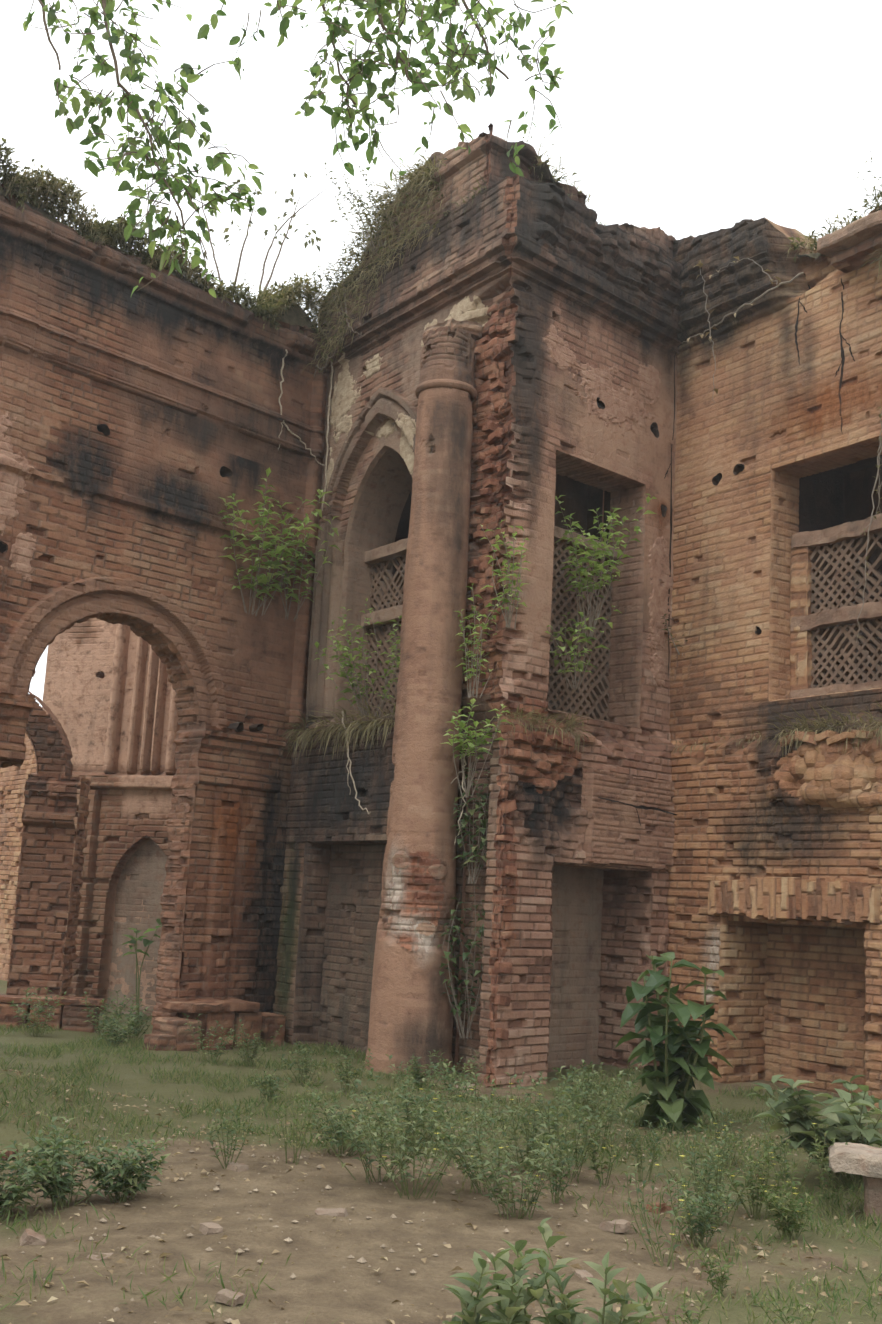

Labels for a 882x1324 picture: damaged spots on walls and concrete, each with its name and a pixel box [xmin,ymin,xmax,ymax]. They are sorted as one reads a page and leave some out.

water stain [54,434,112,509]
water stain [138,473,212,536]
spalling [421,123,595,1088]
crack [598,797,677,826]
spalling [387,851,447,951]